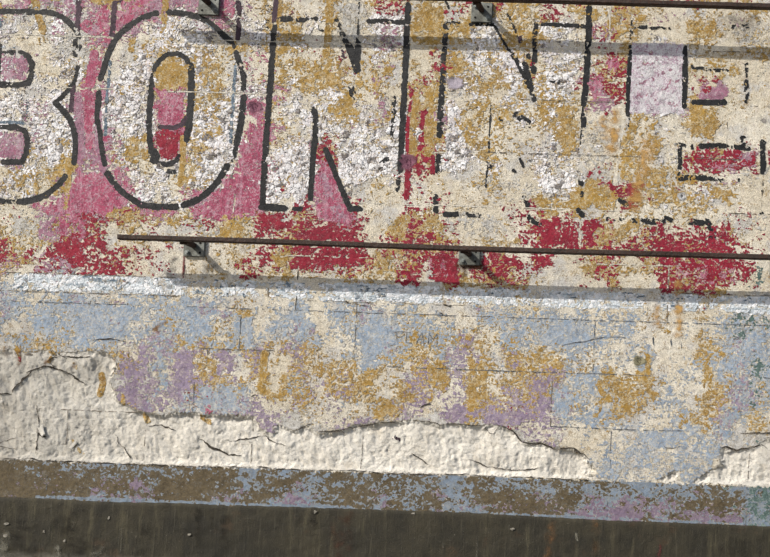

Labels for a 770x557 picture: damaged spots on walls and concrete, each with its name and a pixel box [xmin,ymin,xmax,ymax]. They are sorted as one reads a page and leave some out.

peeling [205,0,249,37]
peeling [1,52,39,81]
peeling [633,68,680,101]
peeling [680,8,770,143]
peeling [348,174,389,216]
peeling [573,255,770,301]
crack [0,338,126,395]
crack [0,408,402,468]
crack [420,403,589,459]
crack [720,432,770,451]
crack [259,454,588,481]